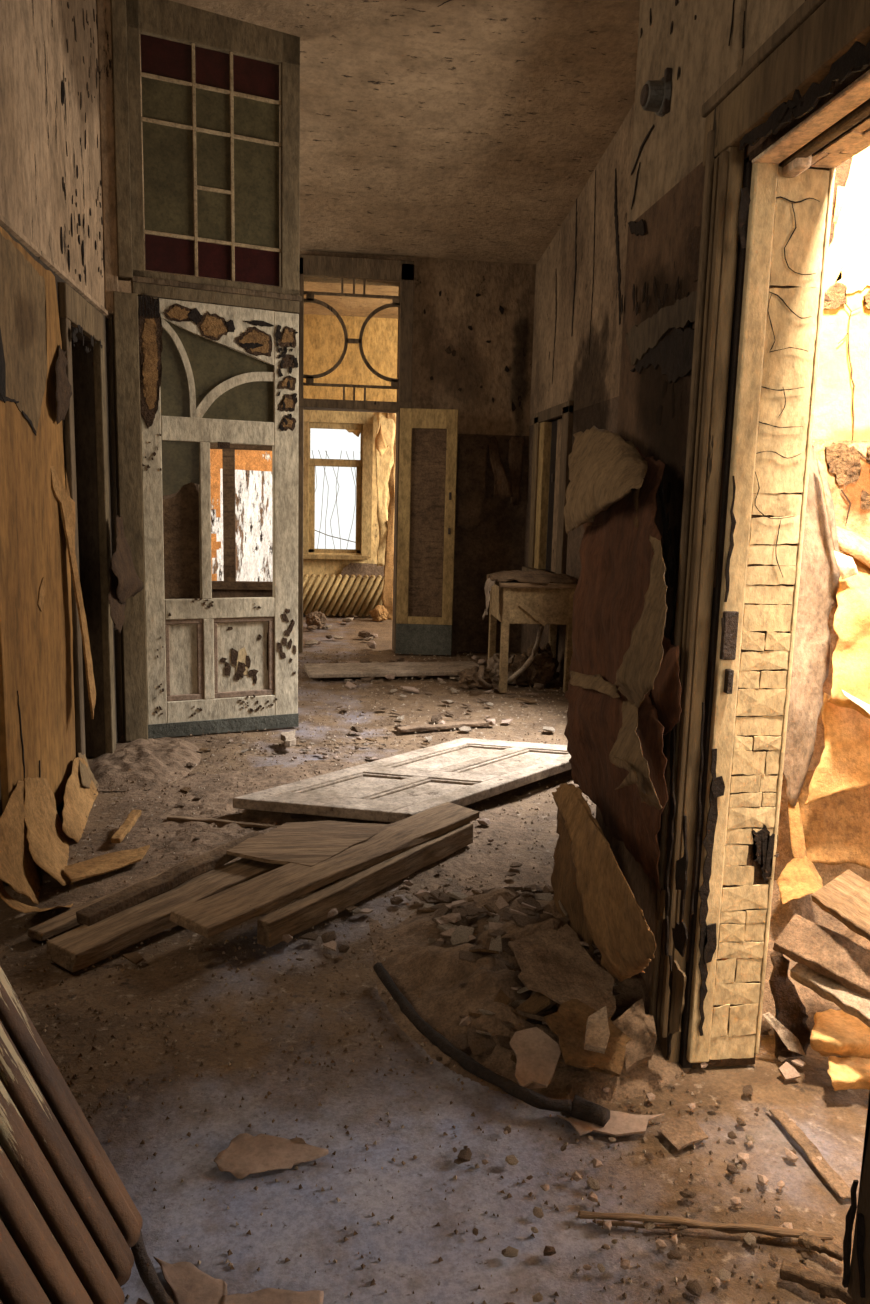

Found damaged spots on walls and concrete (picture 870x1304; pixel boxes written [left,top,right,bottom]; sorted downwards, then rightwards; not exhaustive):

flaking render [61,0,105,283]
peeling [738,187,751,249]
spalling [823,282,847,309]
peeling [721,476,736,636]
crack [709,117,870,1060]
peeling [655,702,725,1060]